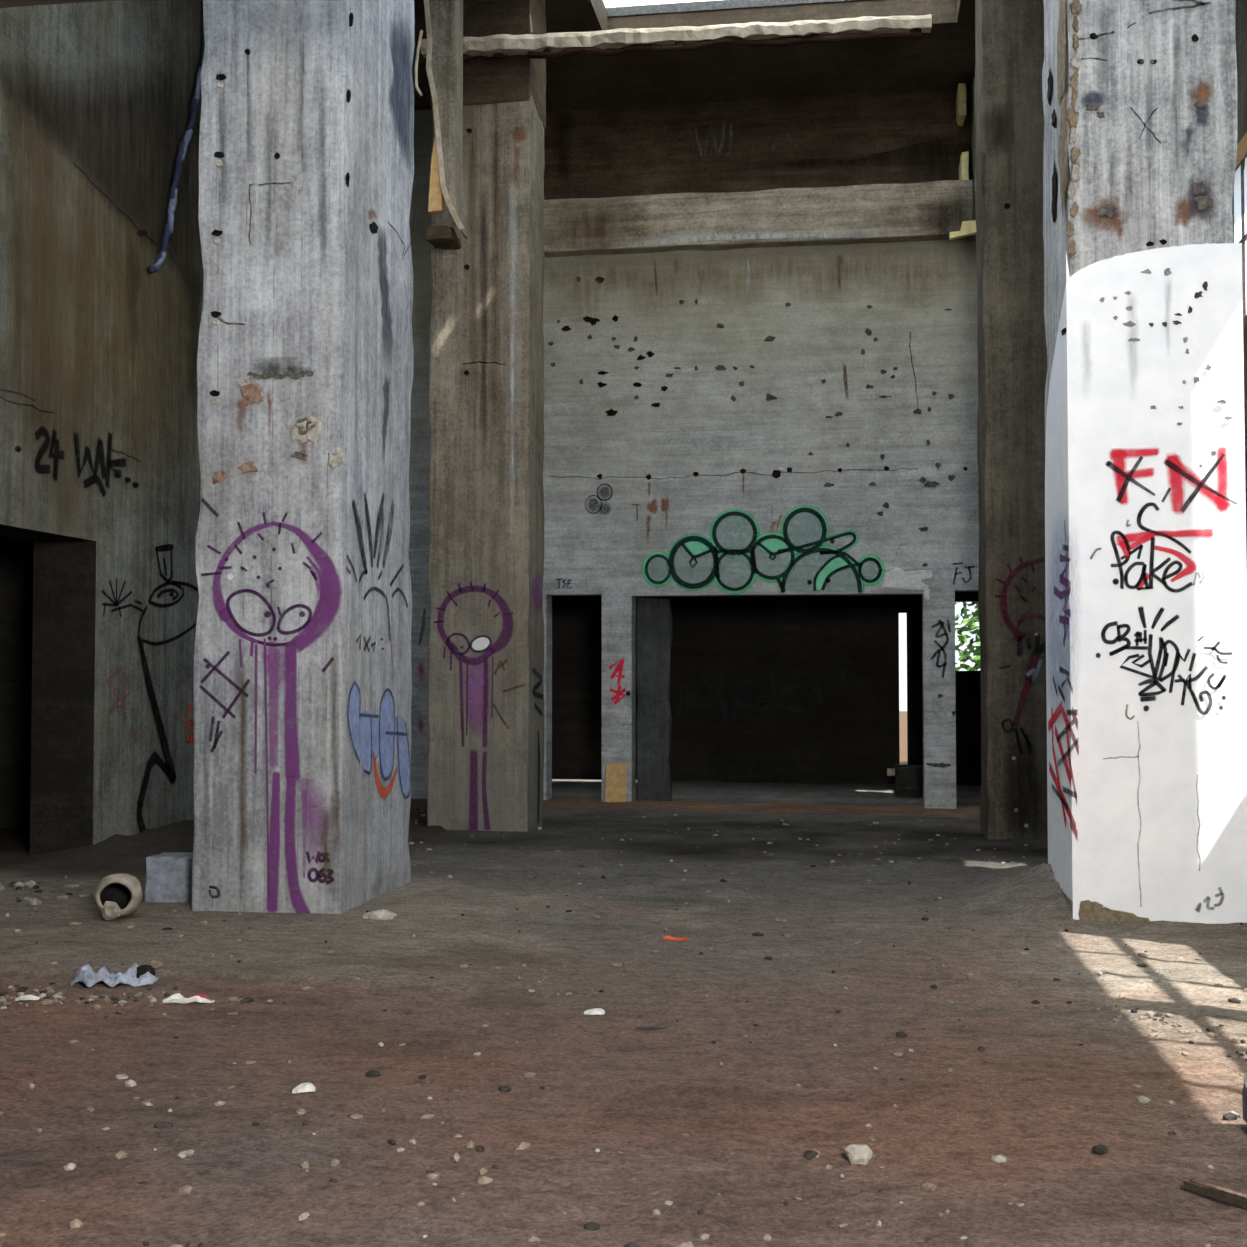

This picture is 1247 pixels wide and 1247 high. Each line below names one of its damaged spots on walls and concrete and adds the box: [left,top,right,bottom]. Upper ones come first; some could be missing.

corrosion [1184,83,1211,154]
leakage [27,79,194,264]
corrosion [1087,200,1123,235]
corrosion [1177,181,1214,225]
spalling [235,363,314,423]
spalling [289,416,323,461]
spalling [212,461,258,485]
peeling [1078,900,1150,922]